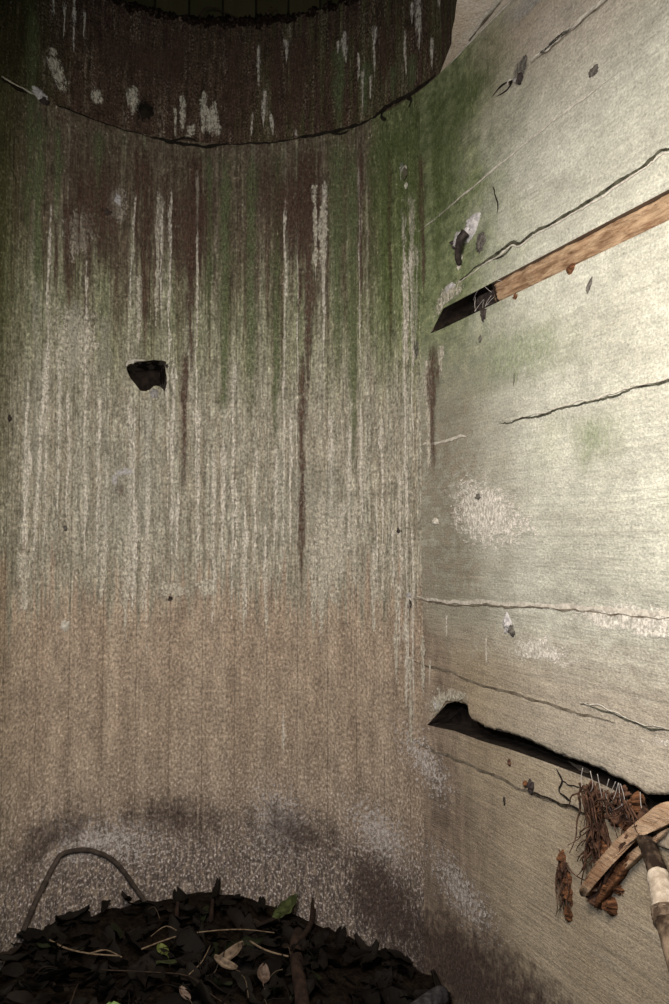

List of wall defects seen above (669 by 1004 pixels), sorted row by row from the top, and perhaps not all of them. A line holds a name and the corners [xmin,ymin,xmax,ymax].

crack [1,75,436,149]
spalling [0,0,457,144]
crack [459,148,669,283]
spalling [126,359,169,399]
water stain [17,0,458,808]
crack [498,377,669,424]
crack [582,703,669,731]
crack [534,769,584,814]
water stain [20,798,219,878]
water stain [240,776,570,1004]